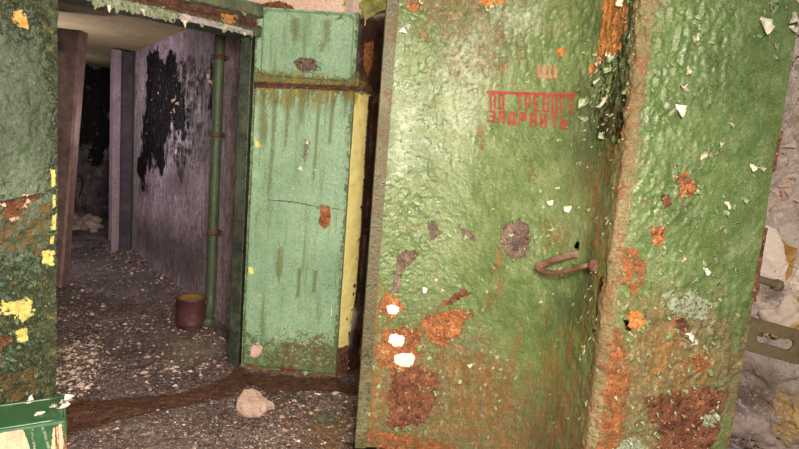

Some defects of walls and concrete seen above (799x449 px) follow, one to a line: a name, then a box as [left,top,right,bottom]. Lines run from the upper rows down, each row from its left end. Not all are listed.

rust [125,0,294,29]
rust [588,0,630,73]
rust [0,193,40,223]
spalling [750,56,799,330]
rust [241,331,358,395]
rust [366,250,526,449]
rust [596,246,729,449]